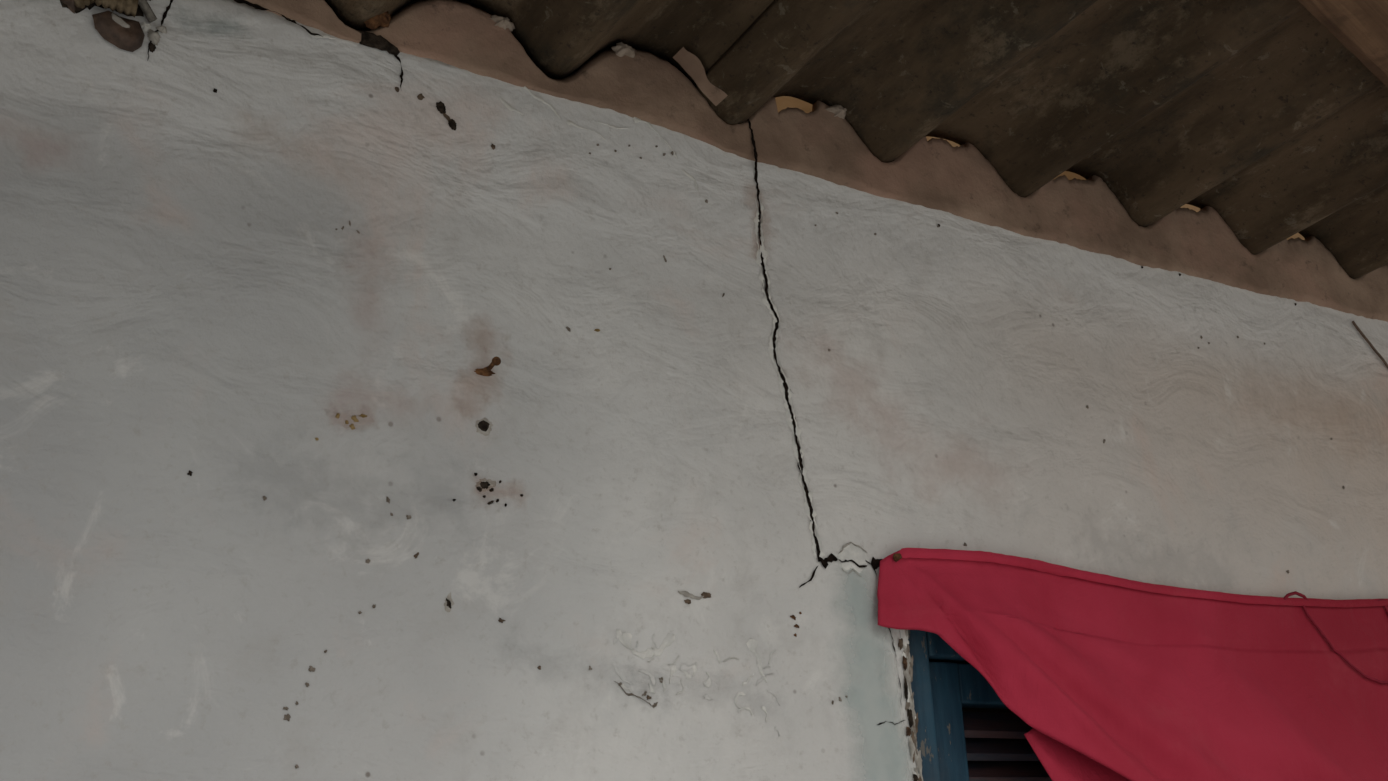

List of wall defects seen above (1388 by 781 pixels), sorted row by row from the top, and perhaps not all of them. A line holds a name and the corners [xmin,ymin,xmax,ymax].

spalling [60,0,167,53]
crack [747,119,882,588]
spalling [877,628,923,781]